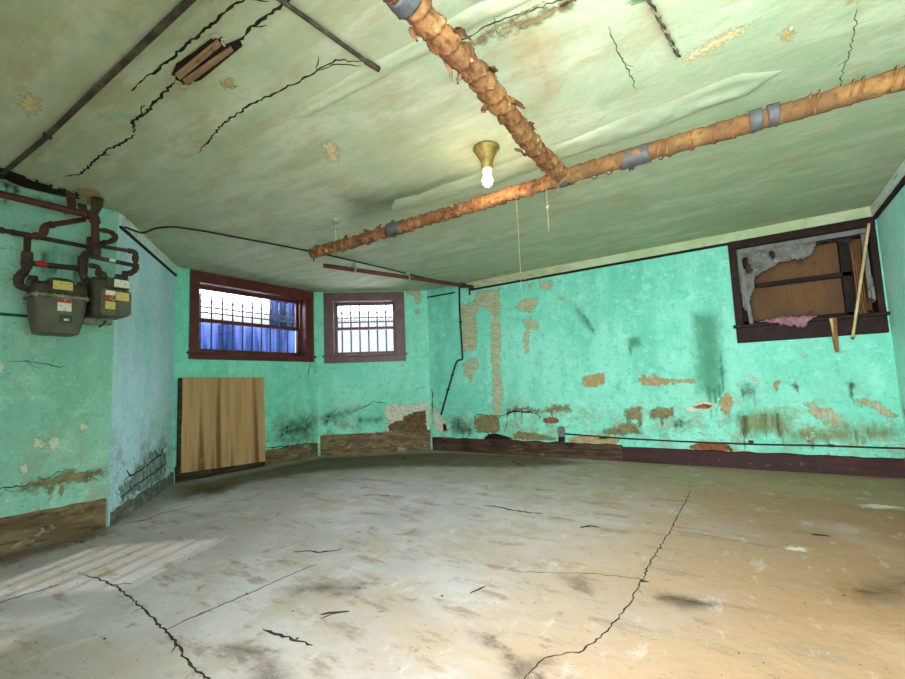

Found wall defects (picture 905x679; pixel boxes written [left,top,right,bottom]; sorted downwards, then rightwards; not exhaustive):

crack [63,0,291,177]
spalling [171,34,245,90]
crack [198,57,362,153]
damp [469,0,574,46]
damp [285,419,313,441]
peeling [461,264,571,441]
peeling [581,373,605,388]
peeling [636,373,695,387]
damp [697,318,719,403]
peeling [686,393,734,417]
crack [78,564,317,679]
crack [523,490,777,679]